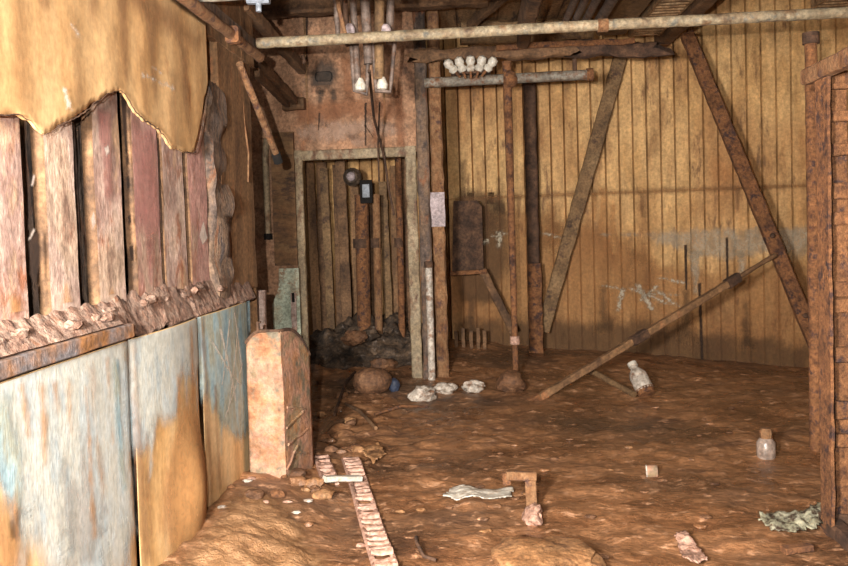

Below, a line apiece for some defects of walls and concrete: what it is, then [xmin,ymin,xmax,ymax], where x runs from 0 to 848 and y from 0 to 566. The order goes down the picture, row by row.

peeling [99,113,111,195]
peeling [41,90,208,154]
spalling [28,173,41,308]
peeling [134,129,157,281]
spalling [140,294,169,307]
spalling [181,284,206,298]
peeling [0,302,249,566]